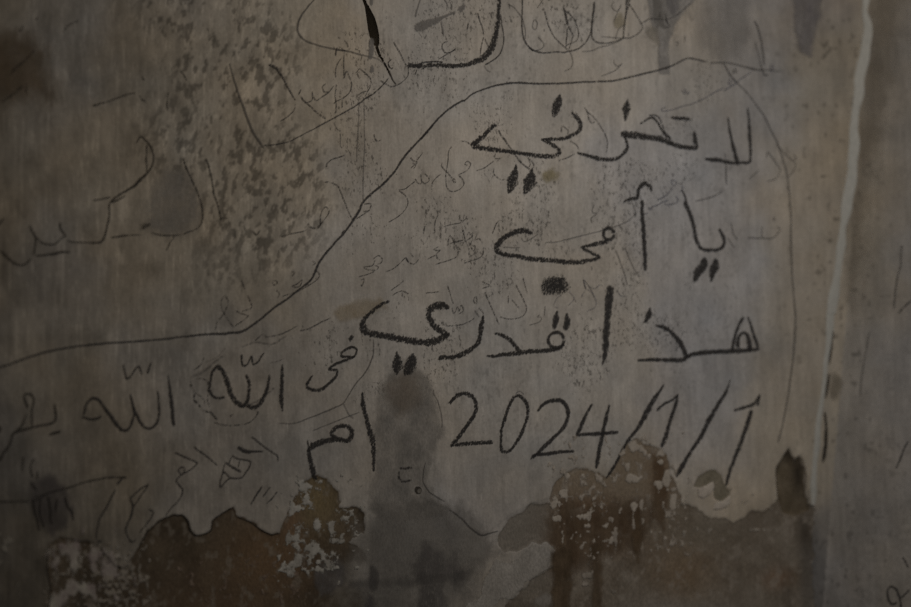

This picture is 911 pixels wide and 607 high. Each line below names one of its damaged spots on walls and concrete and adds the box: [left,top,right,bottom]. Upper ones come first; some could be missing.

crack [363,0,396,84]
flaking render [43,471,369,607]
leakage [360,365,483,607]
flaking render [498,432,816,607]